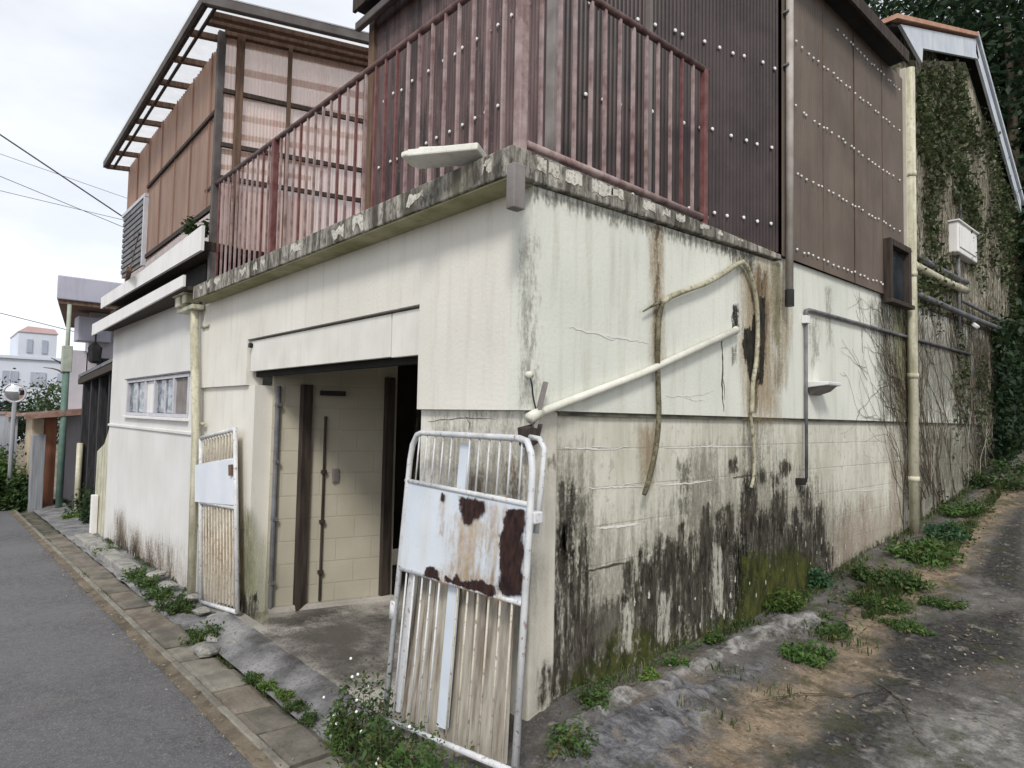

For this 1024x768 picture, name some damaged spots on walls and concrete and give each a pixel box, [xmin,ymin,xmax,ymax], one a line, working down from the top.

peeling [331,214,363,241]
peeling [406,191,424,208]
peeling [537,157,624,200]
peeling [643,200,685,223]
crack [666,341,725,406]
damp [430,420,519,499]
damp [527,186,847,707]
damp [114,518,172,579]